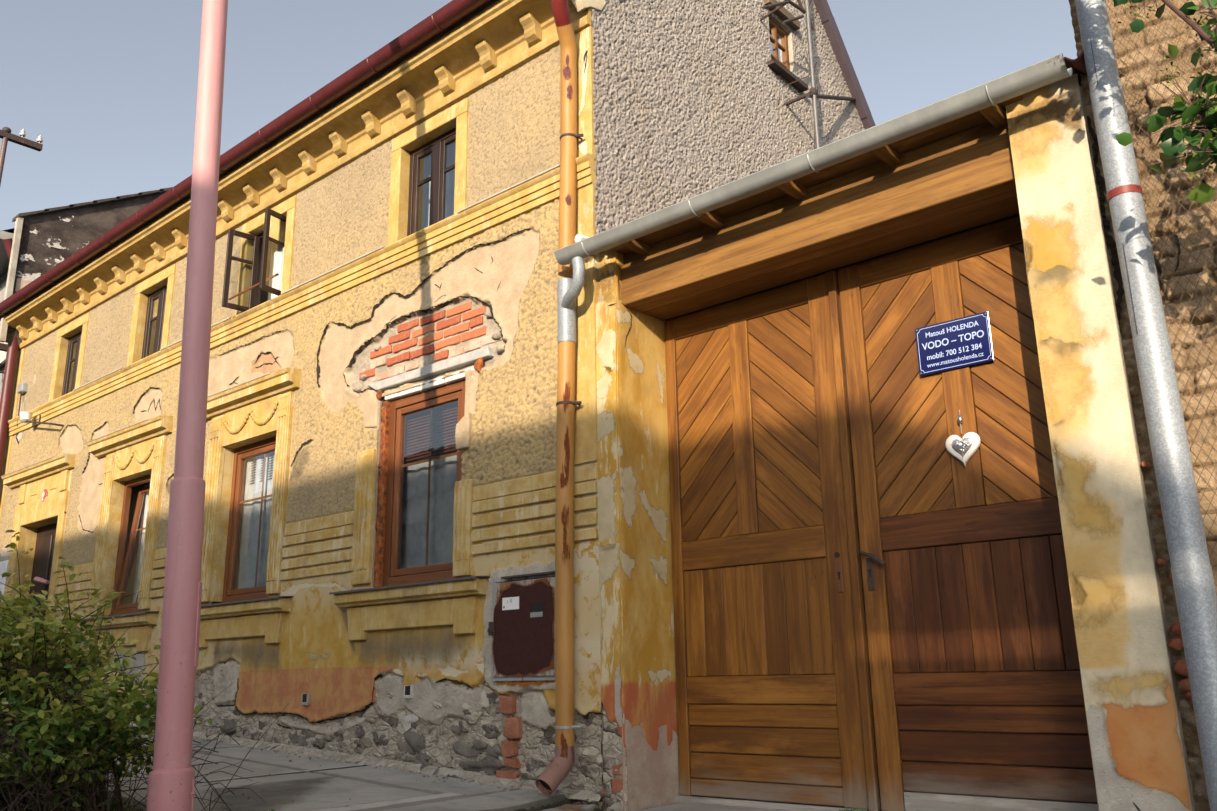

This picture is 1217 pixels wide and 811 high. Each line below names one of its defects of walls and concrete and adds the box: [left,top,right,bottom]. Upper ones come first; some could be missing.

peeling [15,227,89,292]
flaking render [132,387,163,423]
flaking render [208,330,294,396]
flaking render [316,228,540,450]
peeling [596,305,665,442]
flaking render [58,421,110,534]
peeling [598,446,668,653]
peeling [389,560,555,779]
peeling [1086,706,1190,811]